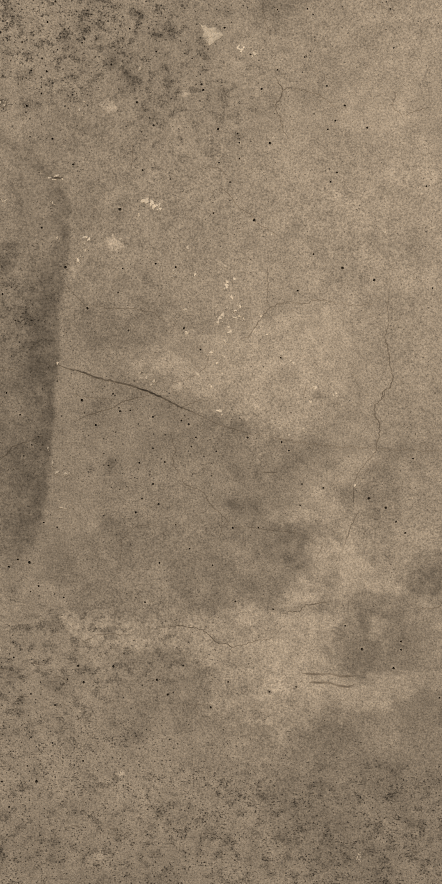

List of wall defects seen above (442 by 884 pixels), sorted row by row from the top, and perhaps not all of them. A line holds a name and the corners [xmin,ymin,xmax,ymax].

peeling [200,24,224,45]
damp [154,68,291,170]
damp [0,123,313,621]
crack [59,271,442,557]
damp [65,295,442,489]
damp [58,479,442,884]